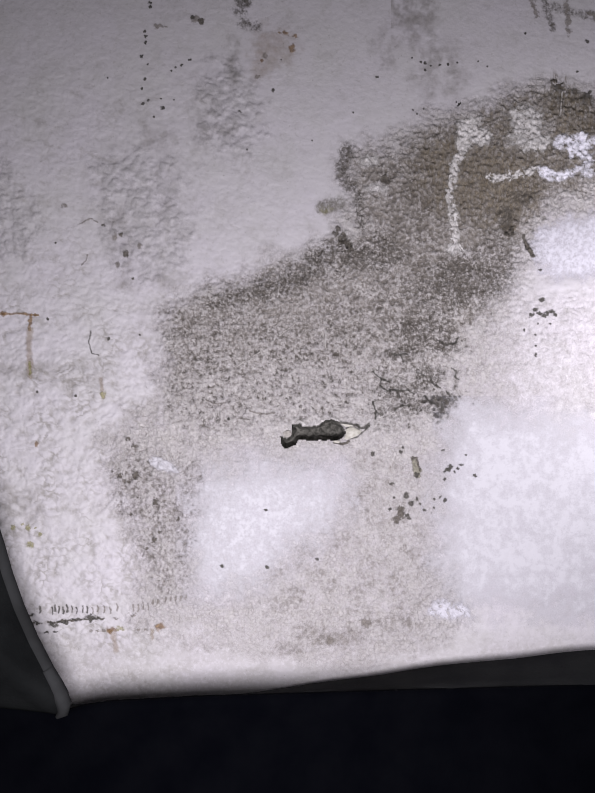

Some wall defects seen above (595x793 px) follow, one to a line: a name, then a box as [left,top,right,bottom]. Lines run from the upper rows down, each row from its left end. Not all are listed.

mould [178,75,595,379]
peeling [96,79,595,666]
mould [112,437,182,558]
mould [388,492,447,524]
crack [29,604,149,633]